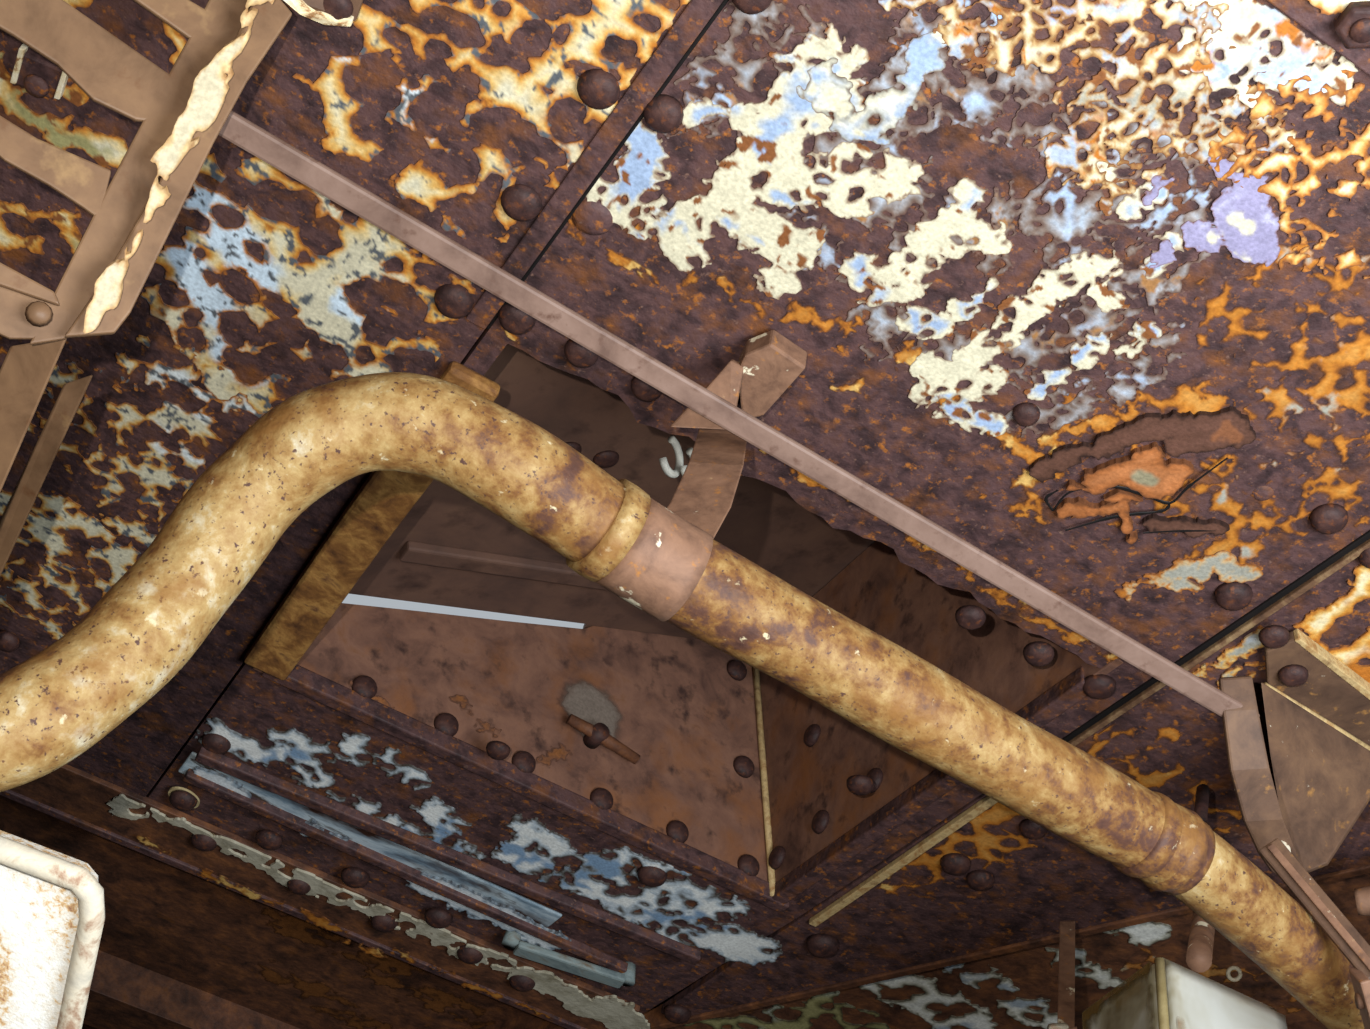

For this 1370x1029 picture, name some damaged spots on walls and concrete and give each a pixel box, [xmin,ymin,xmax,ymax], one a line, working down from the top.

peeling [0,0,485,640]
corrosion [607,249,659,284]
corrosion [716,275,864,352]
peeling [586,0,1370,438]
corrosion [830,378,865,394]
corrosion [987,241,1370,564]
peeling [1293,563,1370,683]
corrosion [1087,725,1242,834]
peeling [193,717,783,972]
corrosion [877,802,1053,898]
peeling [1104,921,1172,947]
peeling [684,959,1058,1029]